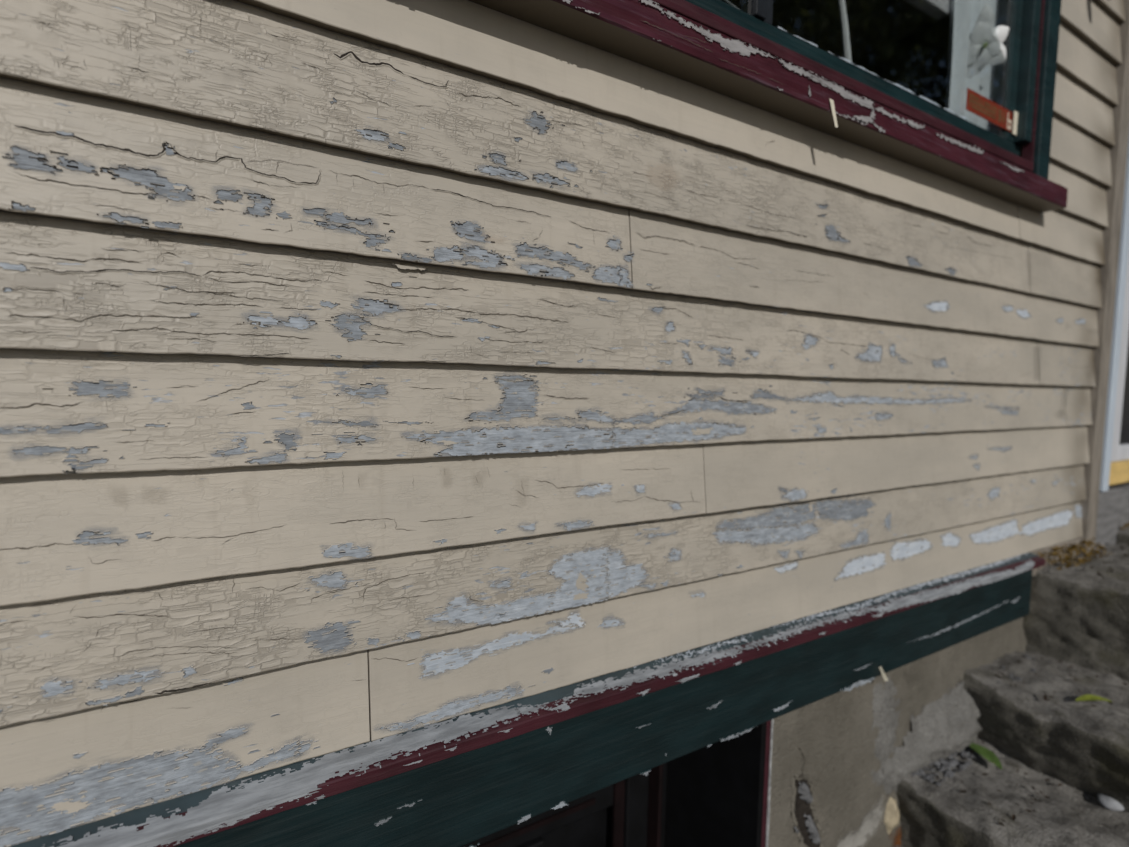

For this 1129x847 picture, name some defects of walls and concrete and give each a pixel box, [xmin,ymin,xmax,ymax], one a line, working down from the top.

crack [267,34,521,107]
peeling [639,0,984,155]
peeling [2,145,195,202]
crack [14,125,760,288]
peeling [214,189,652,342]
peeling [312,358,971,460]
peeling [712,487,1082,580]
crack [71,595,167,650]
crack [119,627,293,657]
crack [232,572,430,601]
crack [102,682,216,709]
peeling [0,542,1035,847]